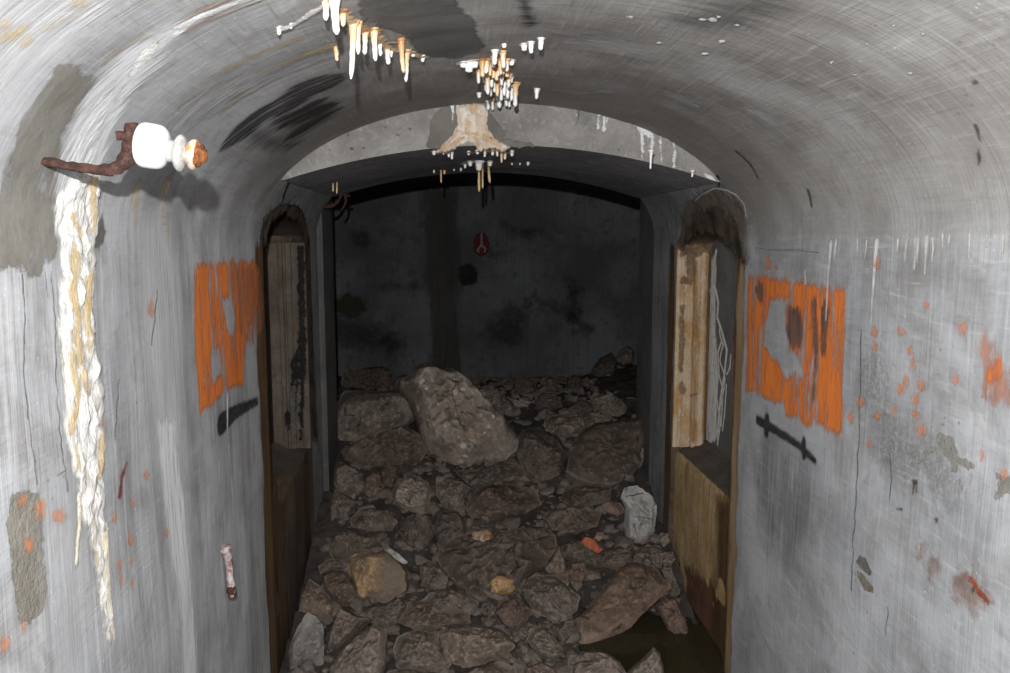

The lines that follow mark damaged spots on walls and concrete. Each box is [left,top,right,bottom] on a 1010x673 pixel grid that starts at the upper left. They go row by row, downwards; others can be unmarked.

water stain [359,0,484,59]
water stain [220,74,345,150]
peeling [426,104,465,149]
peeling [487,110,534,149]
efflorescence [629,123,677,168]
efflorescence [857,237,879,327]
efflorescence [897,234,950,275]
water stain [0,0,261,673]
spalling [907,417,975,473]
rust [968,576,989,603]